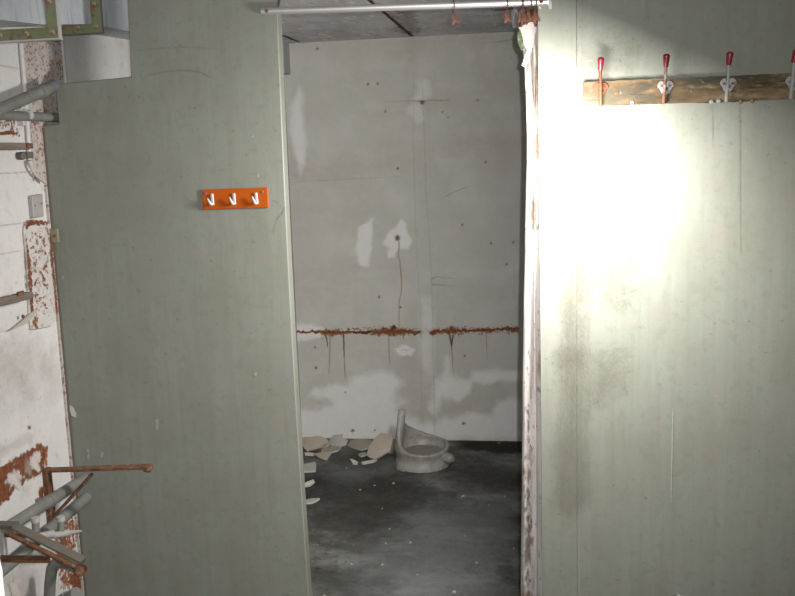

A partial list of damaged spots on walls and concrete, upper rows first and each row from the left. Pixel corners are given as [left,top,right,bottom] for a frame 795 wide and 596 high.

corrosion [0,120,20,137]
flaking render [287,86,309,175]
corrosion [26,219,58,330]
flaking render [355,219,412,267]
corrosion [297,234,520,378]